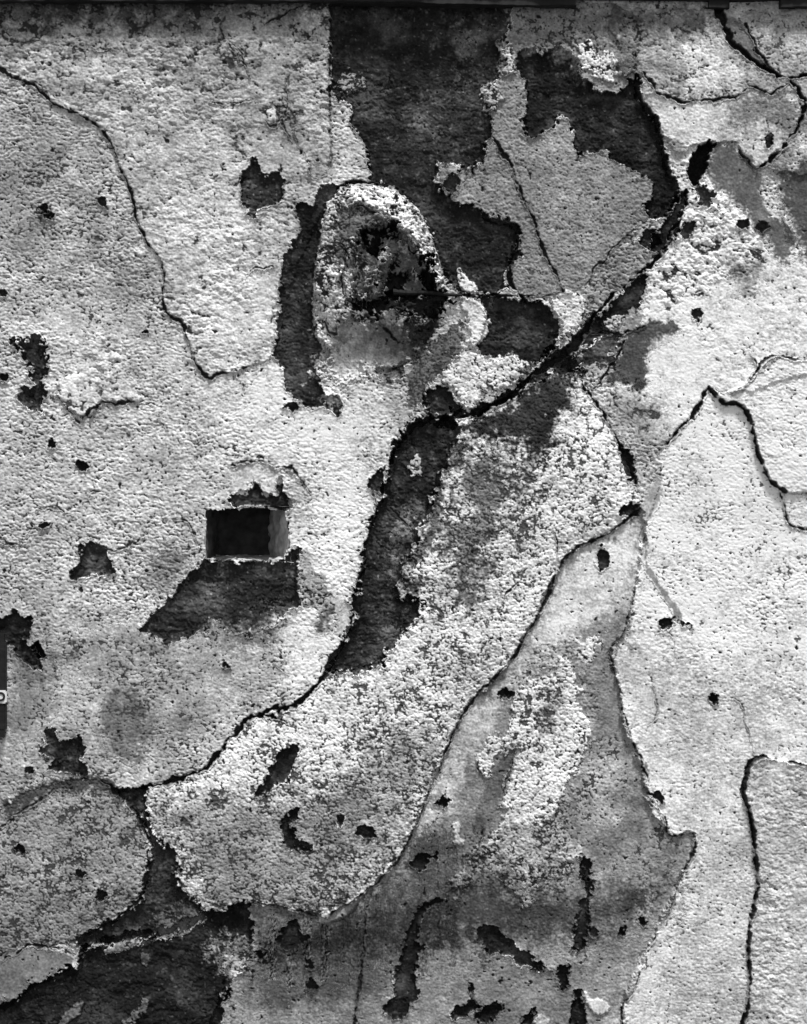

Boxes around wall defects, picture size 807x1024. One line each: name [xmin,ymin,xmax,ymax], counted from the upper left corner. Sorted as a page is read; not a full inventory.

flaking render [0,326,142,419]
crack [0,66,272,389]
flaking render [266,106,276,124]
flaking render [239,156,345,418]
flaking render [324,4,728,677]
crack [632,9,807,180]
crack [666,350,807,532]
flaking render [0,440,697,1024]
crack [0,190,698,1024]
water stain [231,696,695,1024]
crack [720,696,807,1024]